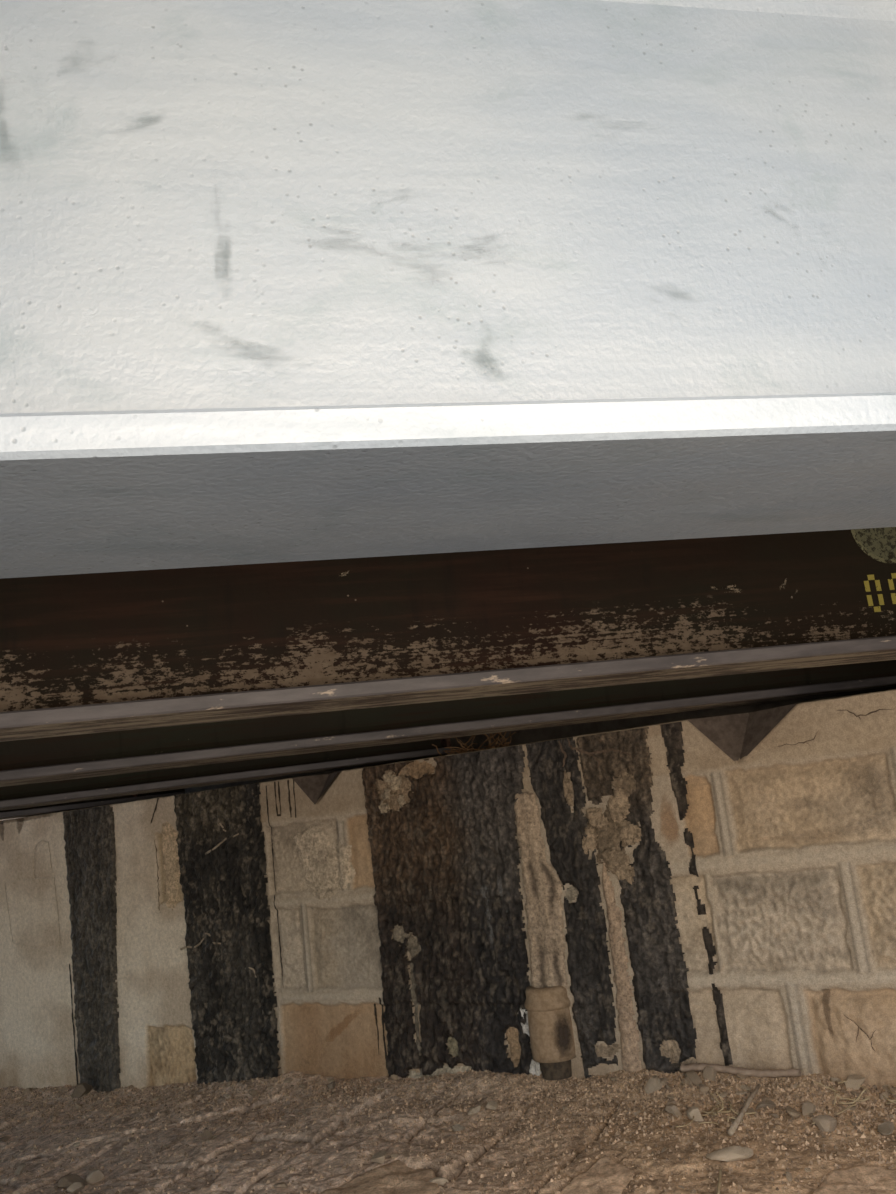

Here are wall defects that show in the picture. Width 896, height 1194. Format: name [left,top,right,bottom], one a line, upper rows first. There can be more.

crack [844,1015,876,1051]